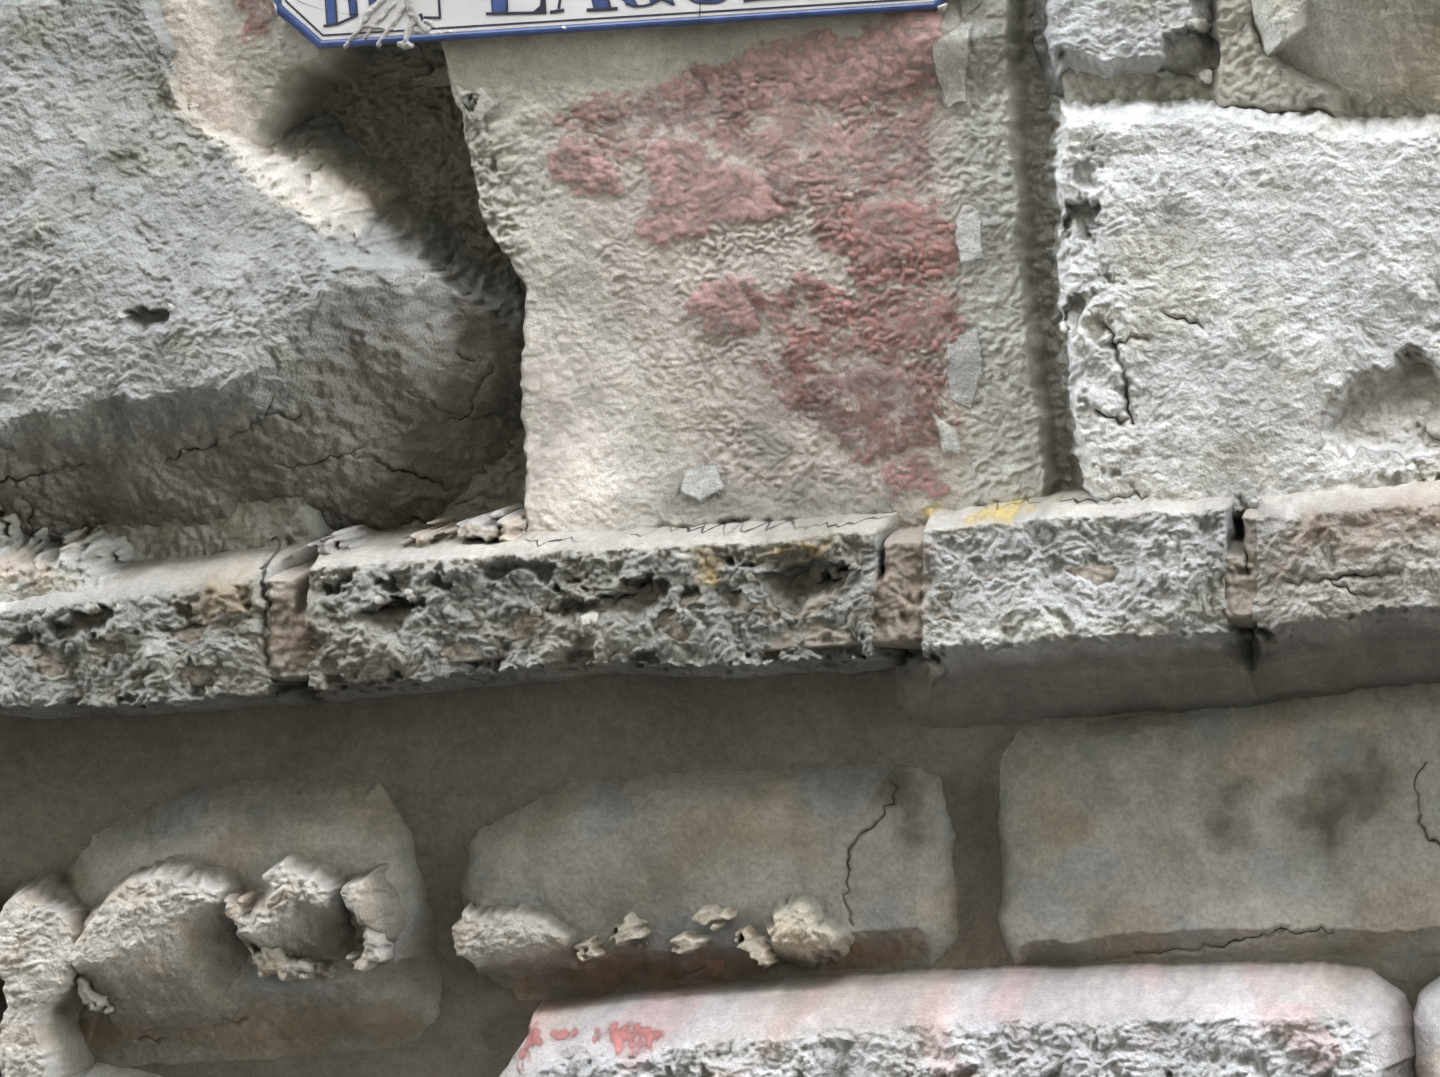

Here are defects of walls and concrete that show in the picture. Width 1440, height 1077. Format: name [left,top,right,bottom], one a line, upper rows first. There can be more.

peeling [547,0,983,500]